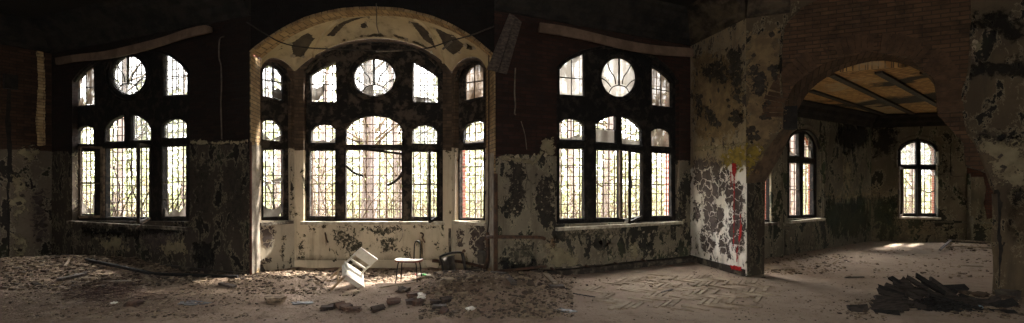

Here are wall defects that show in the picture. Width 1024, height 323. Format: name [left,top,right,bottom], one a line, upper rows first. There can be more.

flaking render [288,16,476,58]
peeling [498,140,556,223]
peeling [560,25,788,257]
flaking render [967,136,1024,219]
peeling [254,225,440,264]
peeling [456,225,491,258]